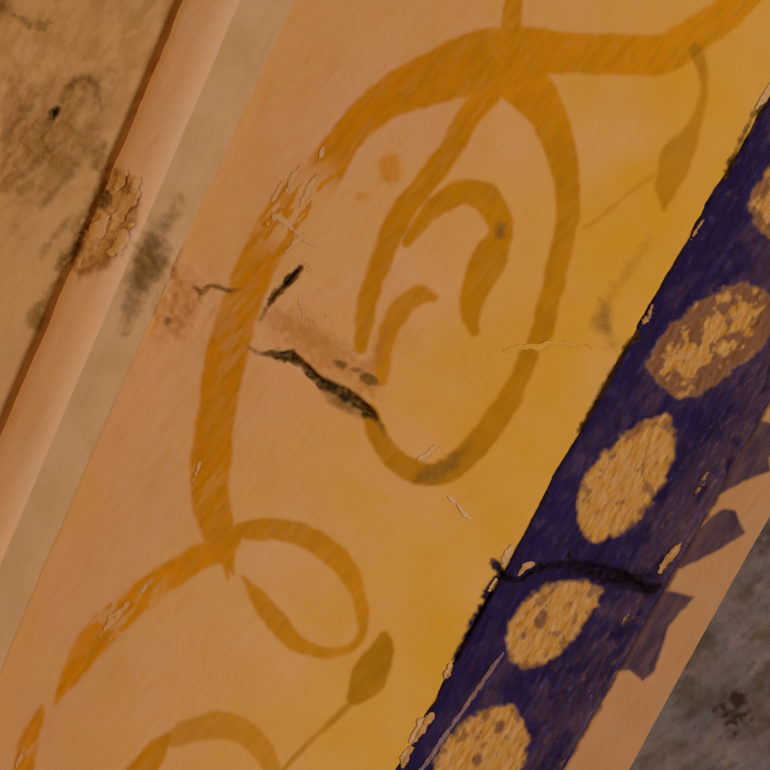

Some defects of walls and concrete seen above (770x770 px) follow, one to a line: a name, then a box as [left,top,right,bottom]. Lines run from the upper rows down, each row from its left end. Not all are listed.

flaking render [57,167,141,273]
water stain [134,234,167,289]
crack [265,265,303,311]
crack [261,350,383,428]
crack [453,544,662,661]